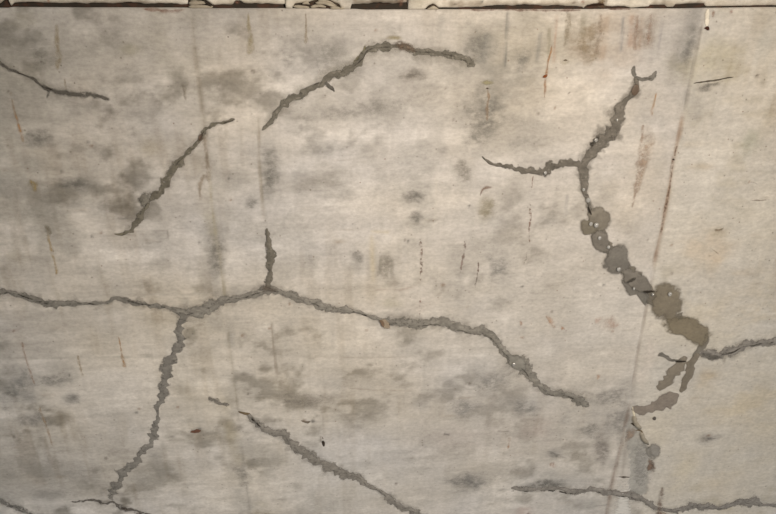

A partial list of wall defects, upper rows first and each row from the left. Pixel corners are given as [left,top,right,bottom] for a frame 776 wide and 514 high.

crack [0,62,109,100]
crack [262,37,475,130]
crack [115,118,235,236]
crack [482,66,776,420]
crack [0,228,589,514]
crack [511,481,776,514]